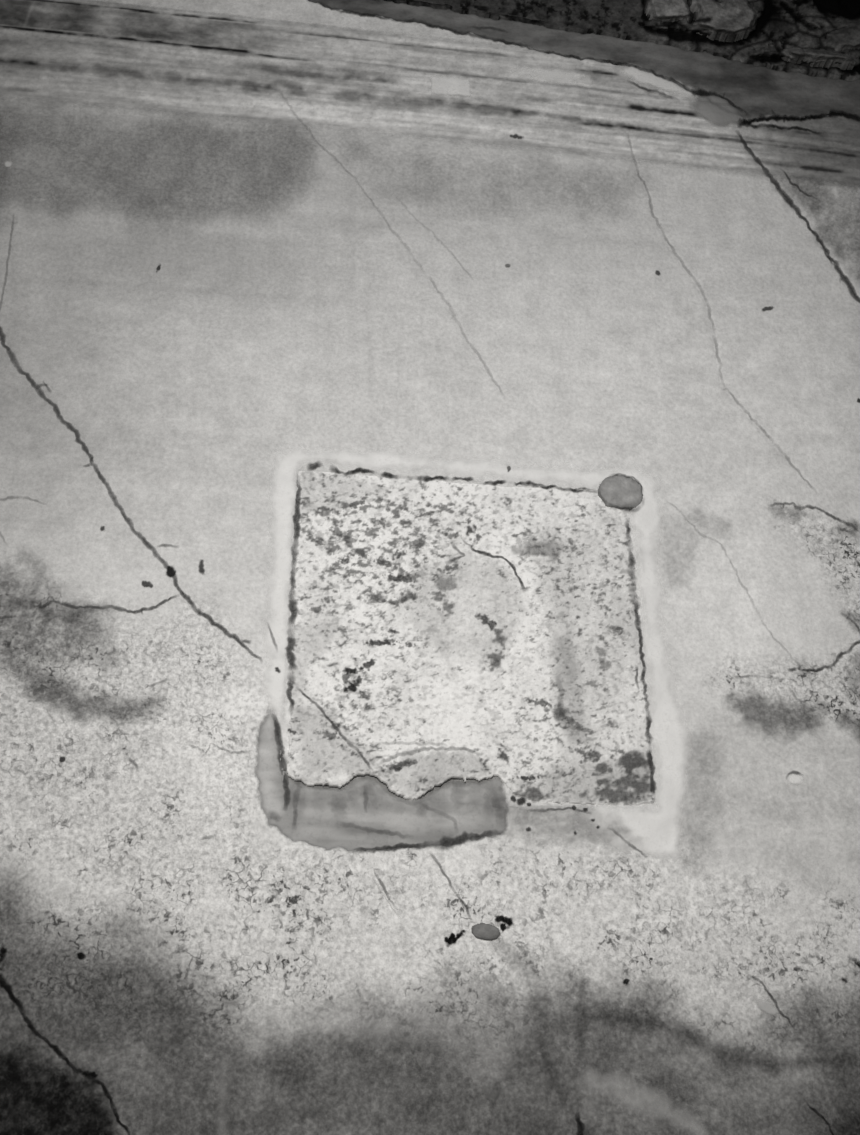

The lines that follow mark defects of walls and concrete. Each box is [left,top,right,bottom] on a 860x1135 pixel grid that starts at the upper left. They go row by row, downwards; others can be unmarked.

spalling [308,0,860,120]
crack [601,59,860,303]
crack [0,327,272,658]
spalling [806,505,859,580]
spalling [806,679,860,721]
spalling [255,710,652,857]
spalling [788,771,802,784]
spalling [32,915,85,959]
spalling [204,929,305,1028]
crack [0,947,129,1132]
crack [576,1116,584,1135]